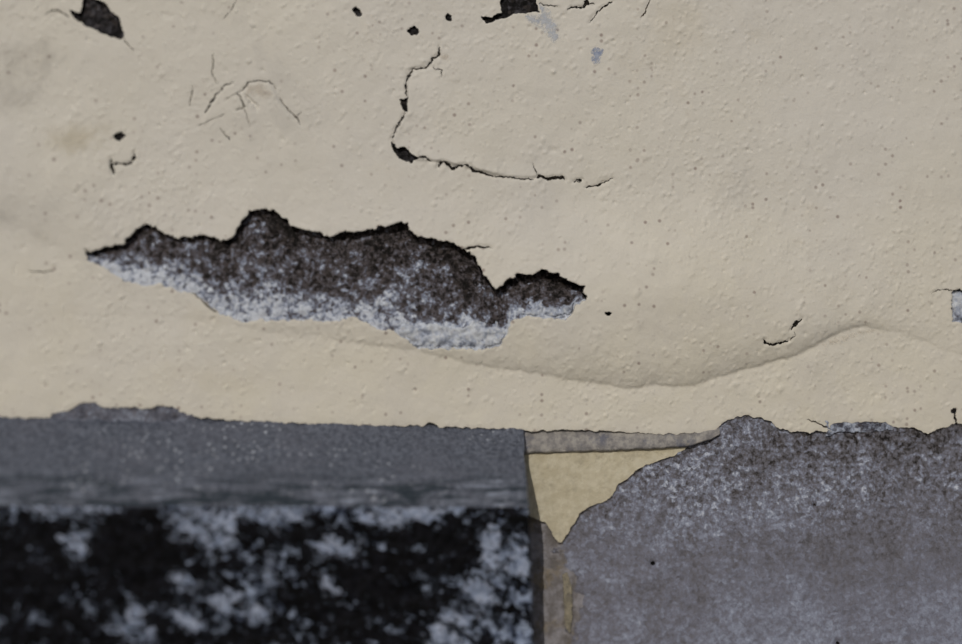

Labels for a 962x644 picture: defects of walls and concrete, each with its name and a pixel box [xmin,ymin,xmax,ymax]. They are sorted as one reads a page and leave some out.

peeling [481,0,540,24]
crack [392,47,442,138]
crack [110,151,136,174]
crack [419,155,612,188]
spalling [84,209,588,351]
spalling [951,289,962,323]
crack [763,319,802,346]
spalling [524,408,962,644]